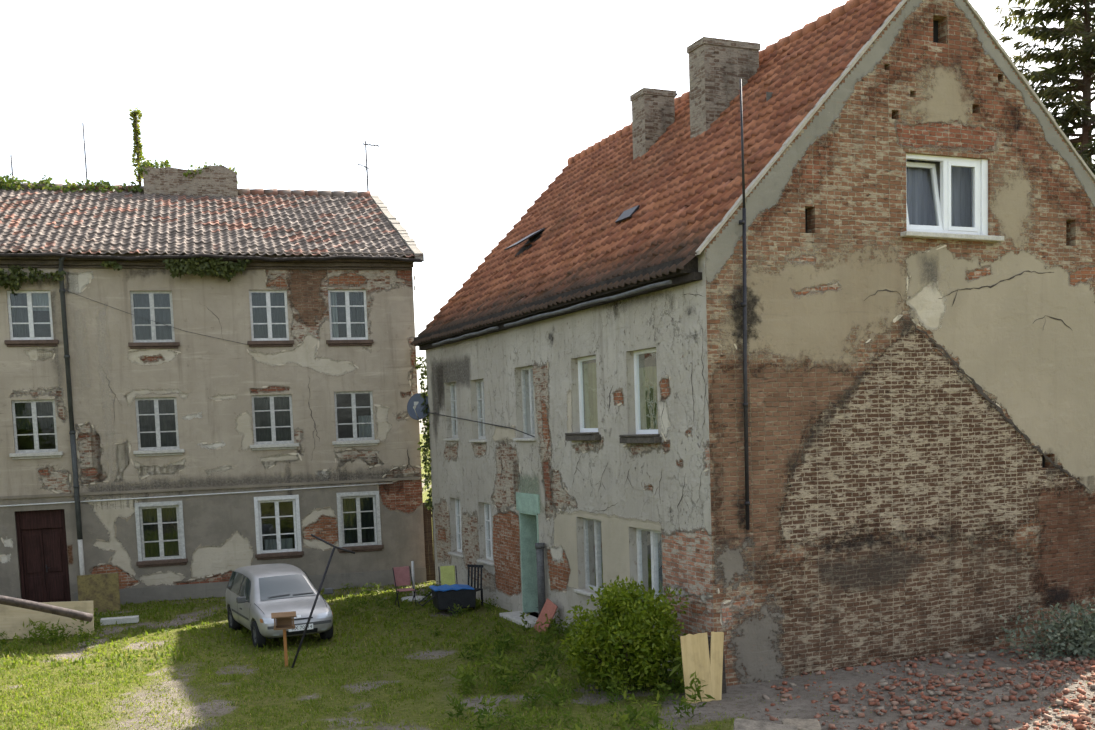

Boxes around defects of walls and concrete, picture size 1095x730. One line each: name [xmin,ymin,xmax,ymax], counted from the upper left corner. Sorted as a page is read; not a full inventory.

flaking render [10,386,254,589]
flaking render [249,385,290,394]
flaking render [259,428,305,470]
flaking render [301,506,339,551]
flaking render [247,269,416,377]
flaking render [400,337,419,398]
flaking render [333,425,522,597]
flaking render [546,545,571,593]
flaking render [623,375,683,468]
flaking render [660,1,1095,678]
crack [865,289,1090,491]
crack [939,270,1054,306]